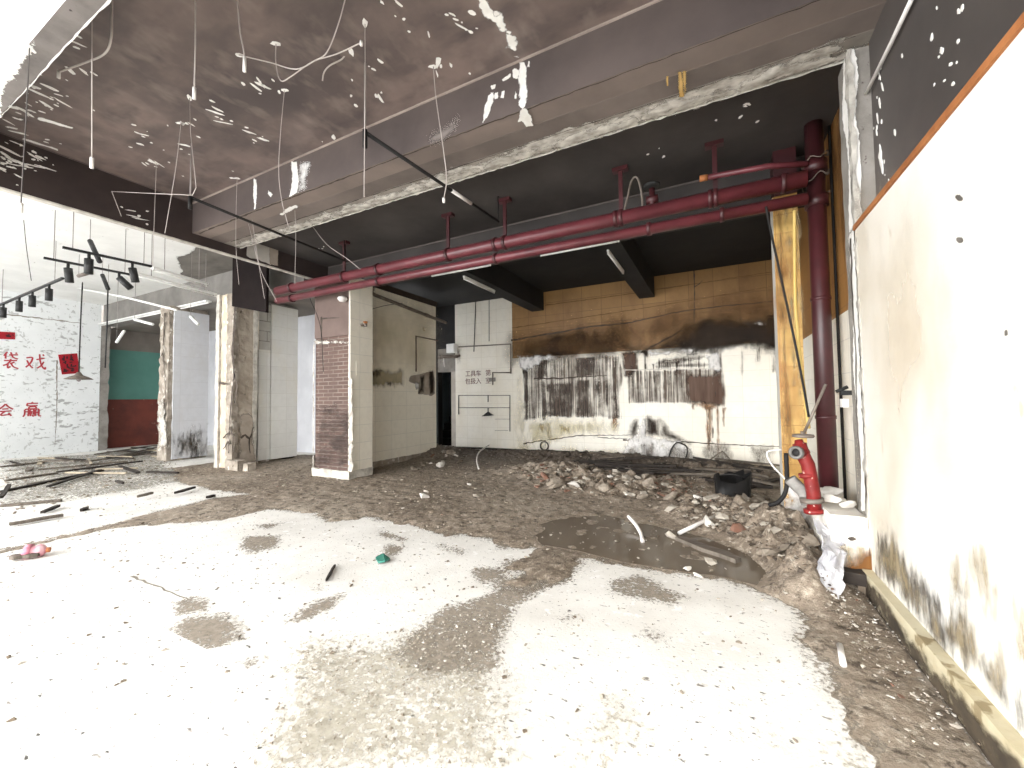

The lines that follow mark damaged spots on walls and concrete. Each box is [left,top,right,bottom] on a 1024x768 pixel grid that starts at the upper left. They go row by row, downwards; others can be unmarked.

peeling [444,0,533,127]
spalling [177,37,870,519]
spalling [157,399,167,449]
mould [178,433,208,458]
leakage [516,321,725,436]
corrosion [692,403,726,450]
leakage [866,537,1021,768]